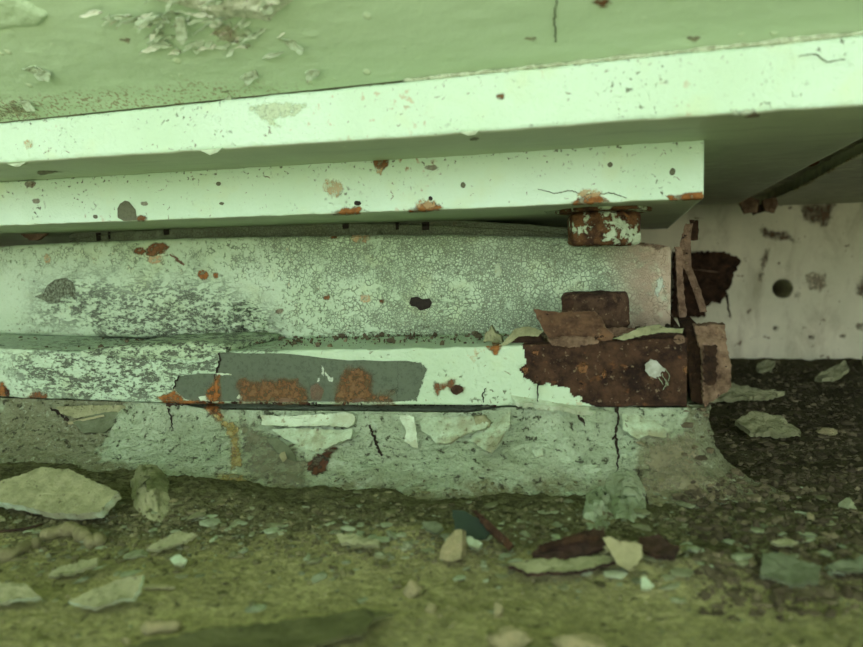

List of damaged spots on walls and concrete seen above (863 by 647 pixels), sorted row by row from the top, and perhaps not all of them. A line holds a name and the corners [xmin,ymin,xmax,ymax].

peeling [79,0,267,57]
rust [134,242,169,264]
peeling [35,278,76,304]
rust [534,309,614,341]
rust [235,378,323,406]
peeling [173,352,427,489]
rust [334,367,394,406]
flaking render [400,395,595,454]
rust [701,344,718,386]
crack [612,407,648,504]
flaking render [0,456,446,611]
flaking render [453,485,722,592]